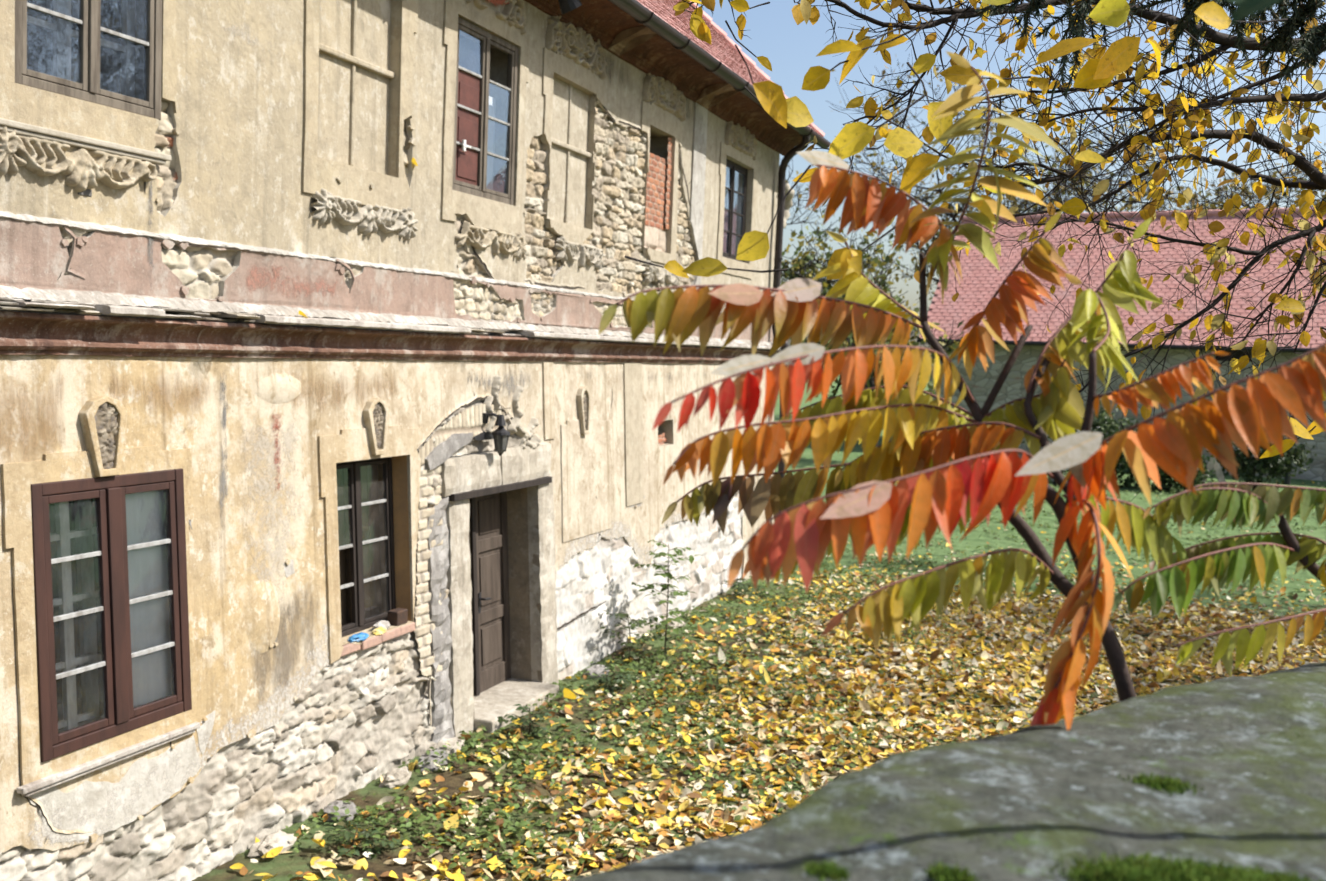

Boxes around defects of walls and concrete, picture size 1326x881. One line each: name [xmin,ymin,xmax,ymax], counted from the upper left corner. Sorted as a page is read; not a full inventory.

flaking render [451,135,567,324]
flaking render [583,99,660,327]
flaking render [676,160,695,291]
flaking render [452,409,534,456]
flaking render [0,398,485,881]
flaking render [555,491,744,682]